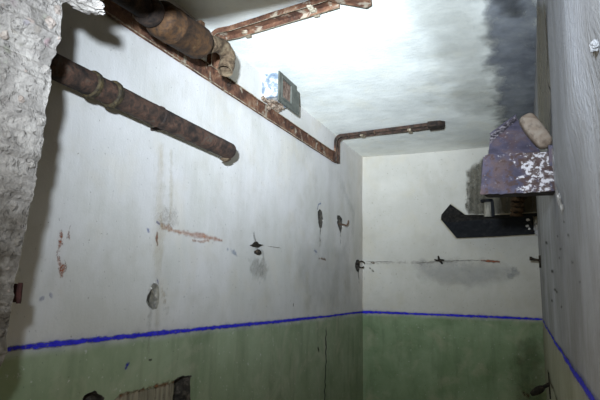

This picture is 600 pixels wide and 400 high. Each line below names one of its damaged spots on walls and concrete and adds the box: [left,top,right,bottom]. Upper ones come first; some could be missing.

flaking render [146,281,159,310]
crack [321,331,329,400]
flaking render [115,375,192,400]